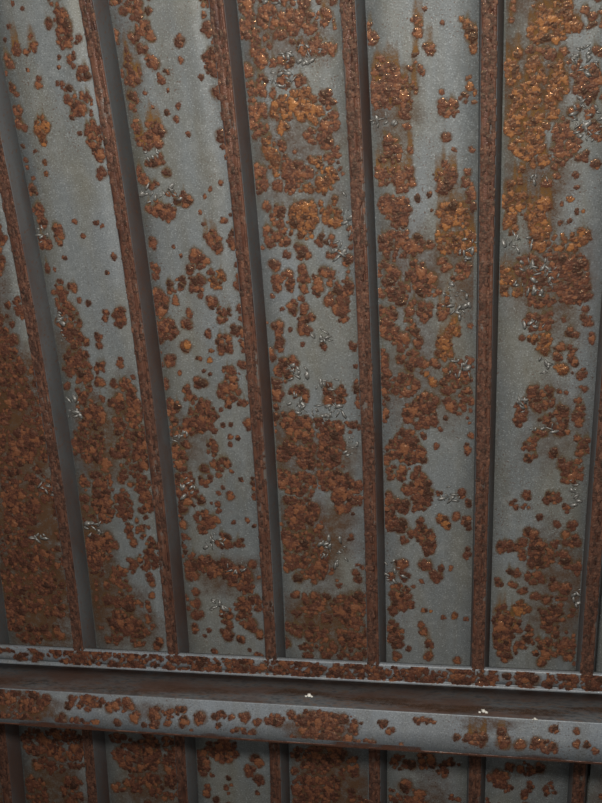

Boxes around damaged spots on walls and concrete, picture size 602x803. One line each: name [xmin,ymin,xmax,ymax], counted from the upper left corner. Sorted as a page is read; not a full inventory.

rust [3,24,68,260]
rust [45,0,107,181]
rust [109,0,181,191]
rust [145,190,194,223]
rust [174,33,185,65]
rust [197,0,220,100]
rust [198,209,235,255]
rust [216,129,226,160]
rust [367,22,380,46]
rust [499,0,602,484]
rust [149,244,245,376]
rust [0,279,602,692]